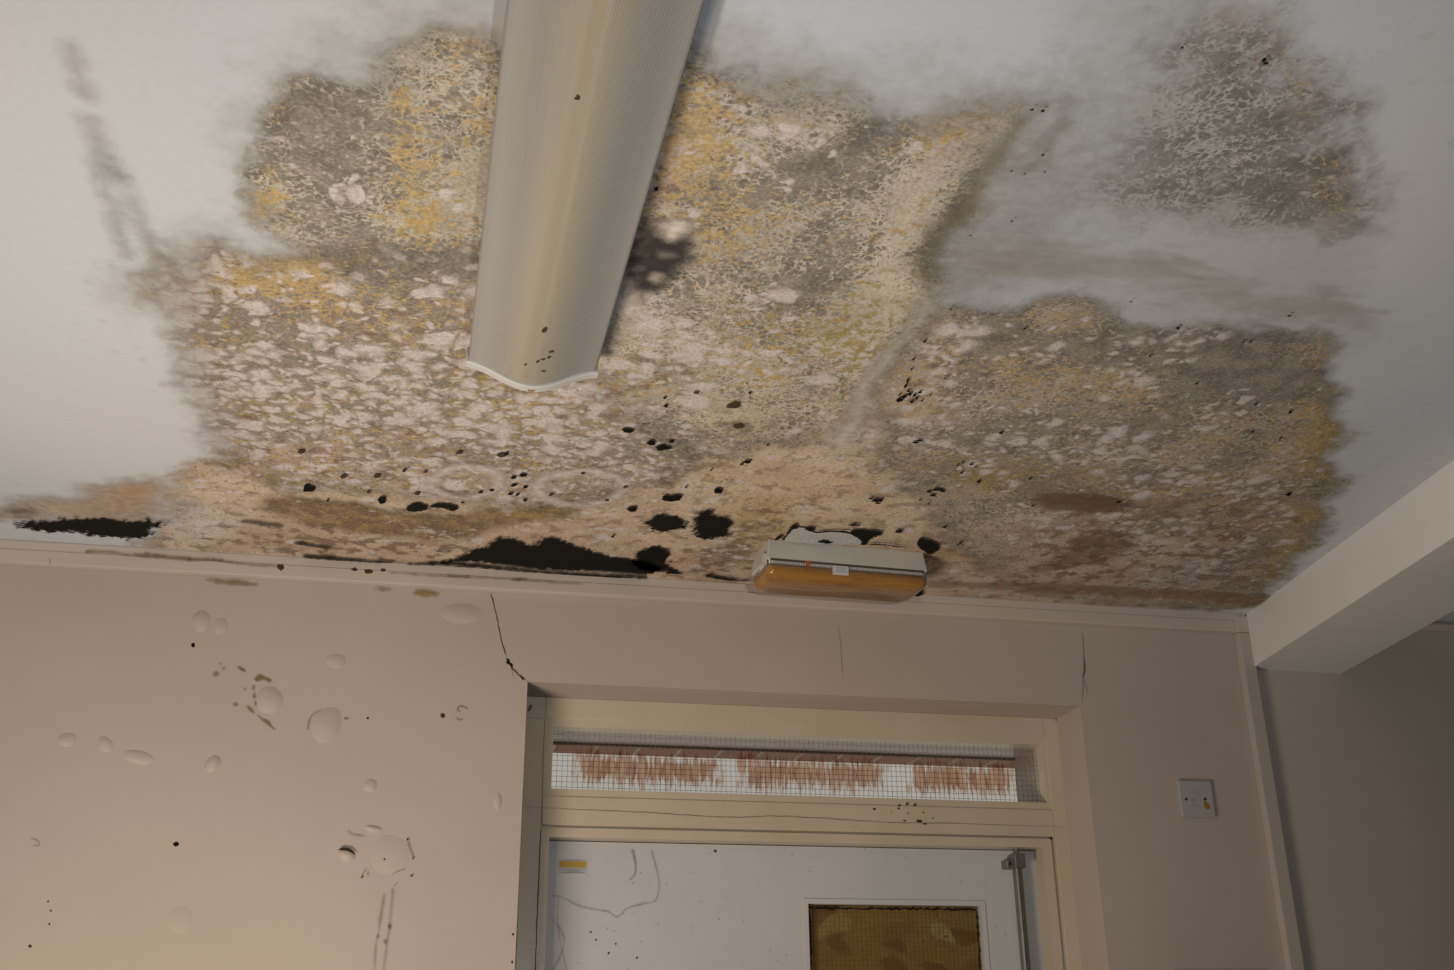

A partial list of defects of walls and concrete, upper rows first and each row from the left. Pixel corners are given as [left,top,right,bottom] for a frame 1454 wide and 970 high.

water stain [0,28,1366,611]
crack [491,593,527,681]
crack [527,717,1055,970]